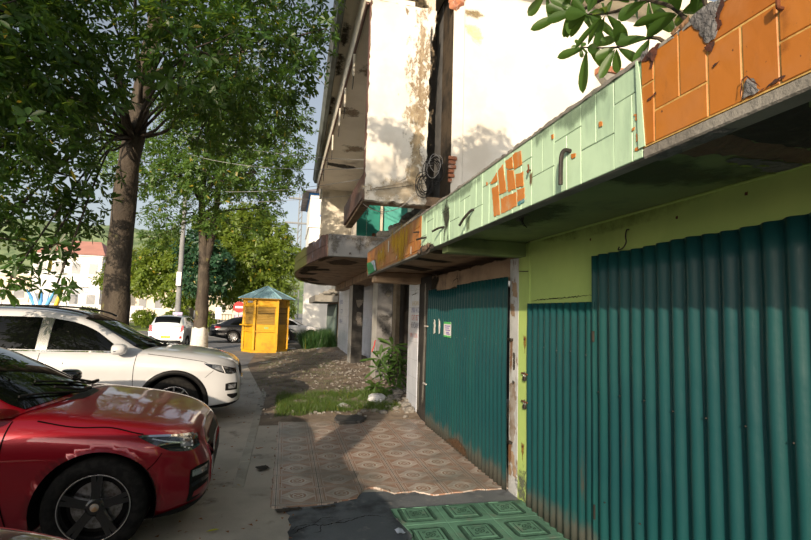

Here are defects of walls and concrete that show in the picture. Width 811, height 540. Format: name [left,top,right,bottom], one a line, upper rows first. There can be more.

spalling [449,0,465,11]
spalling [670,0,724,52]
spalling [740,75,786,99]
peeling [486,151,525,216]
leakage [610,161,741,186]
leakage [299,235,386,284]